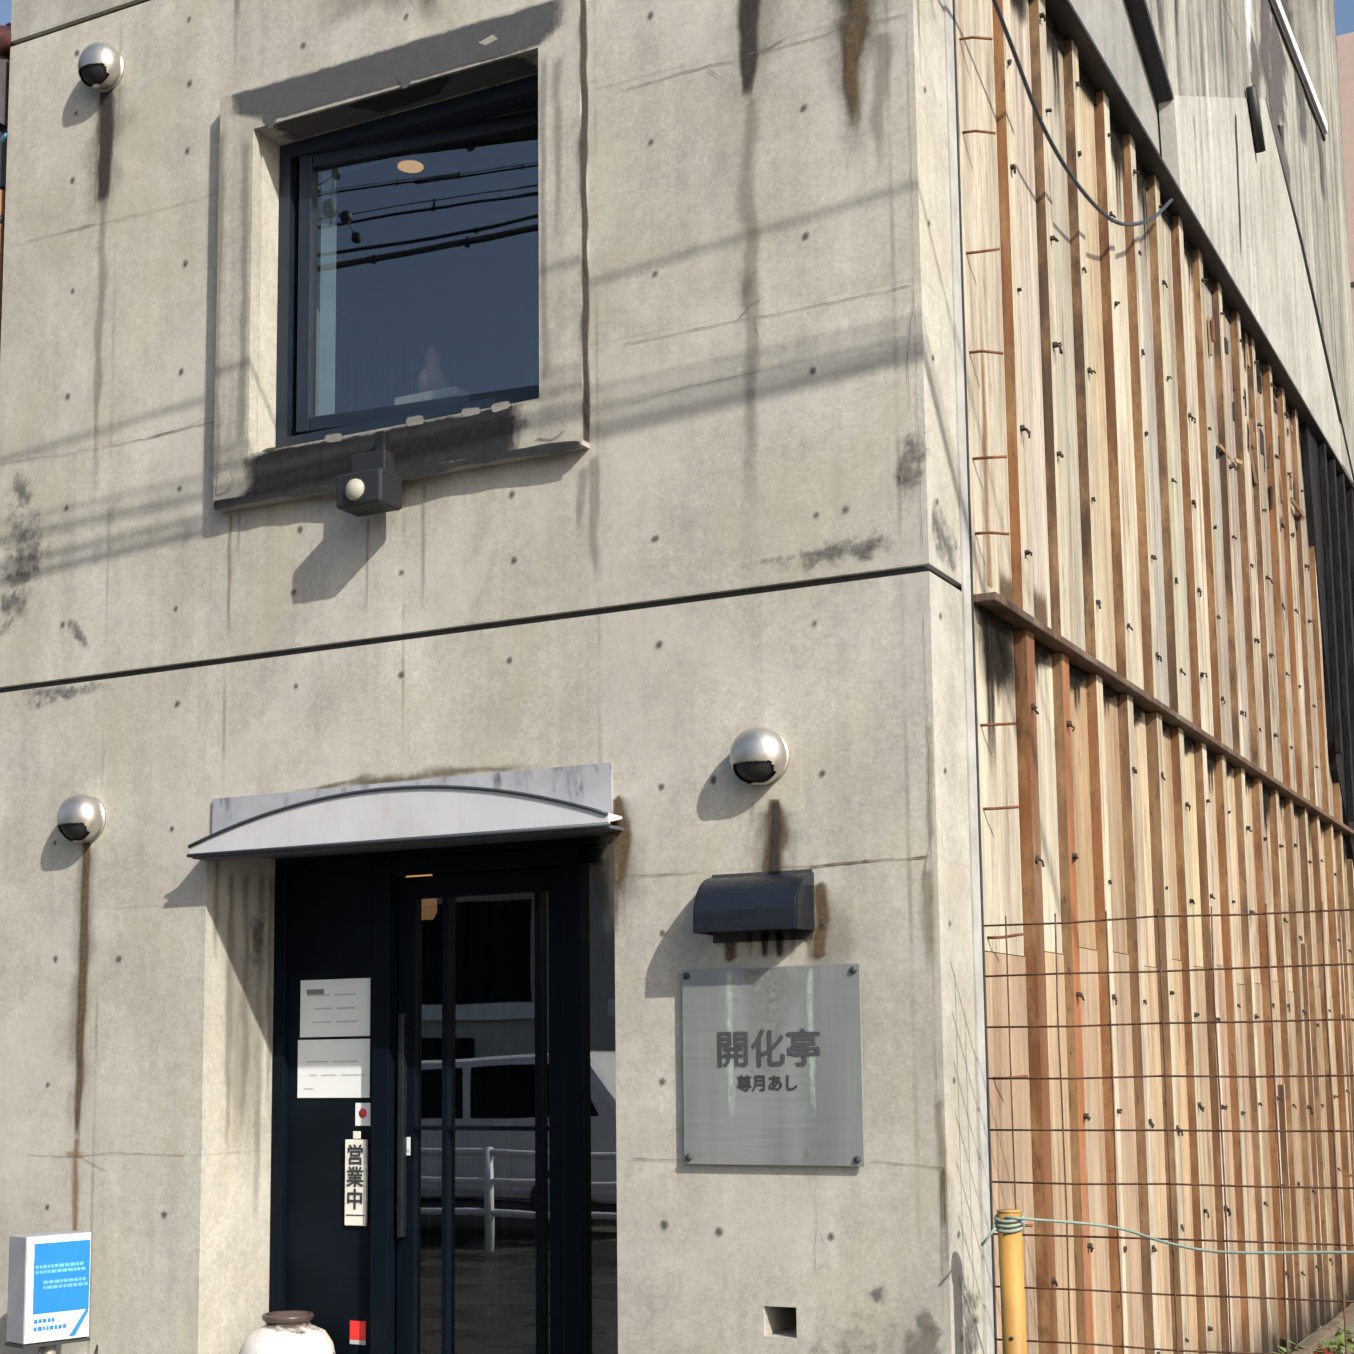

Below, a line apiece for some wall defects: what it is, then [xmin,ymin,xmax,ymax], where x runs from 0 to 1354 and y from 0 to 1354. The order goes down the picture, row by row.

water stain [739,0,760,90]
water stain [98,89,114,199]
corrosion [983,369,1014,604]
corrosion [1035,590,1048,626]
water stain [978,604,1018,751]
water stain [1034,639,1052,678]
water stain [1133,704,1142,724]
water stain [1162,720,1347,863]
corrosion [763,799,787,875]
corrosion [811,882,829,958]
spalling [907,1312,941,1354]
spalling [962,1291,979,1354]